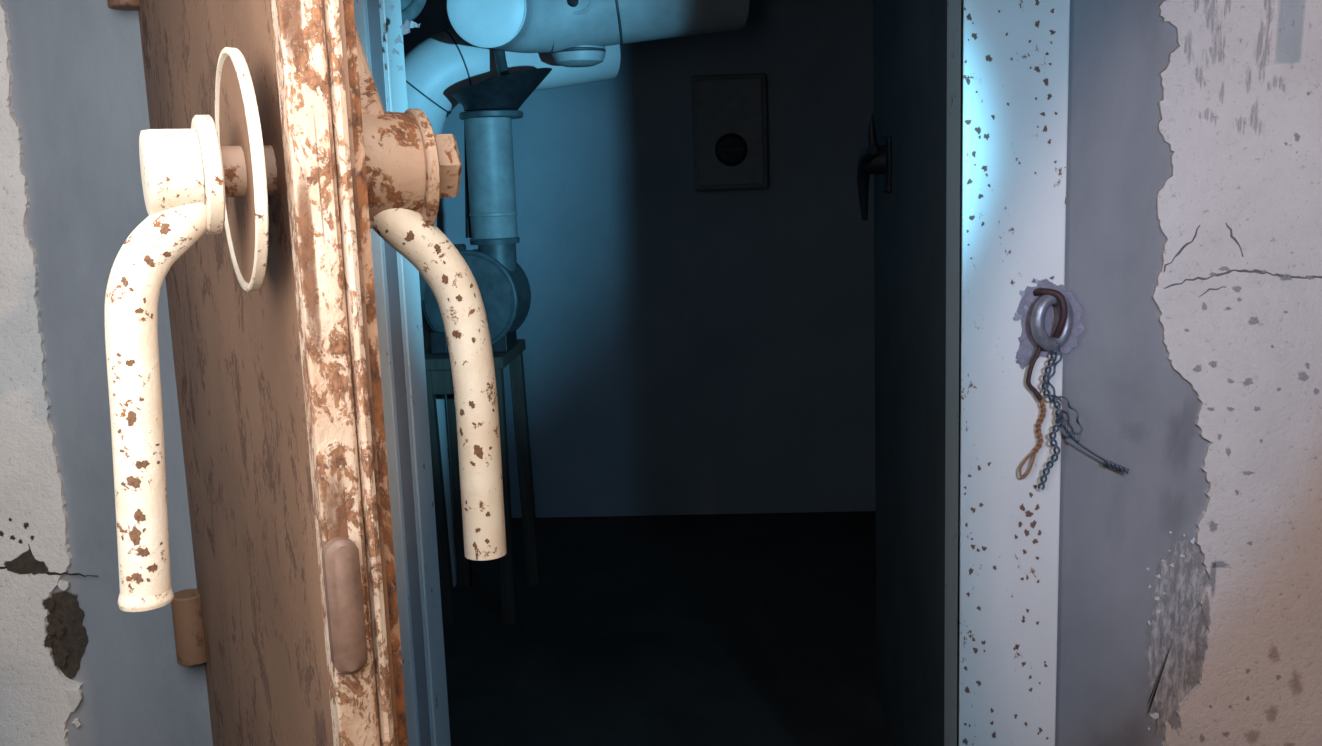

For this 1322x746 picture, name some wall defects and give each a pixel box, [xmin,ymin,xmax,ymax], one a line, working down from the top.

rust [1029,0,1058,144]
rust [965,115,995,199]
crack [1164,223,1322,297]
crack [0,544,98,577]
rust [964,462,991,552]
rust [1015,485,1041,560]
spalling [0,517,88,728]
peeling [1145,531,1227,735]